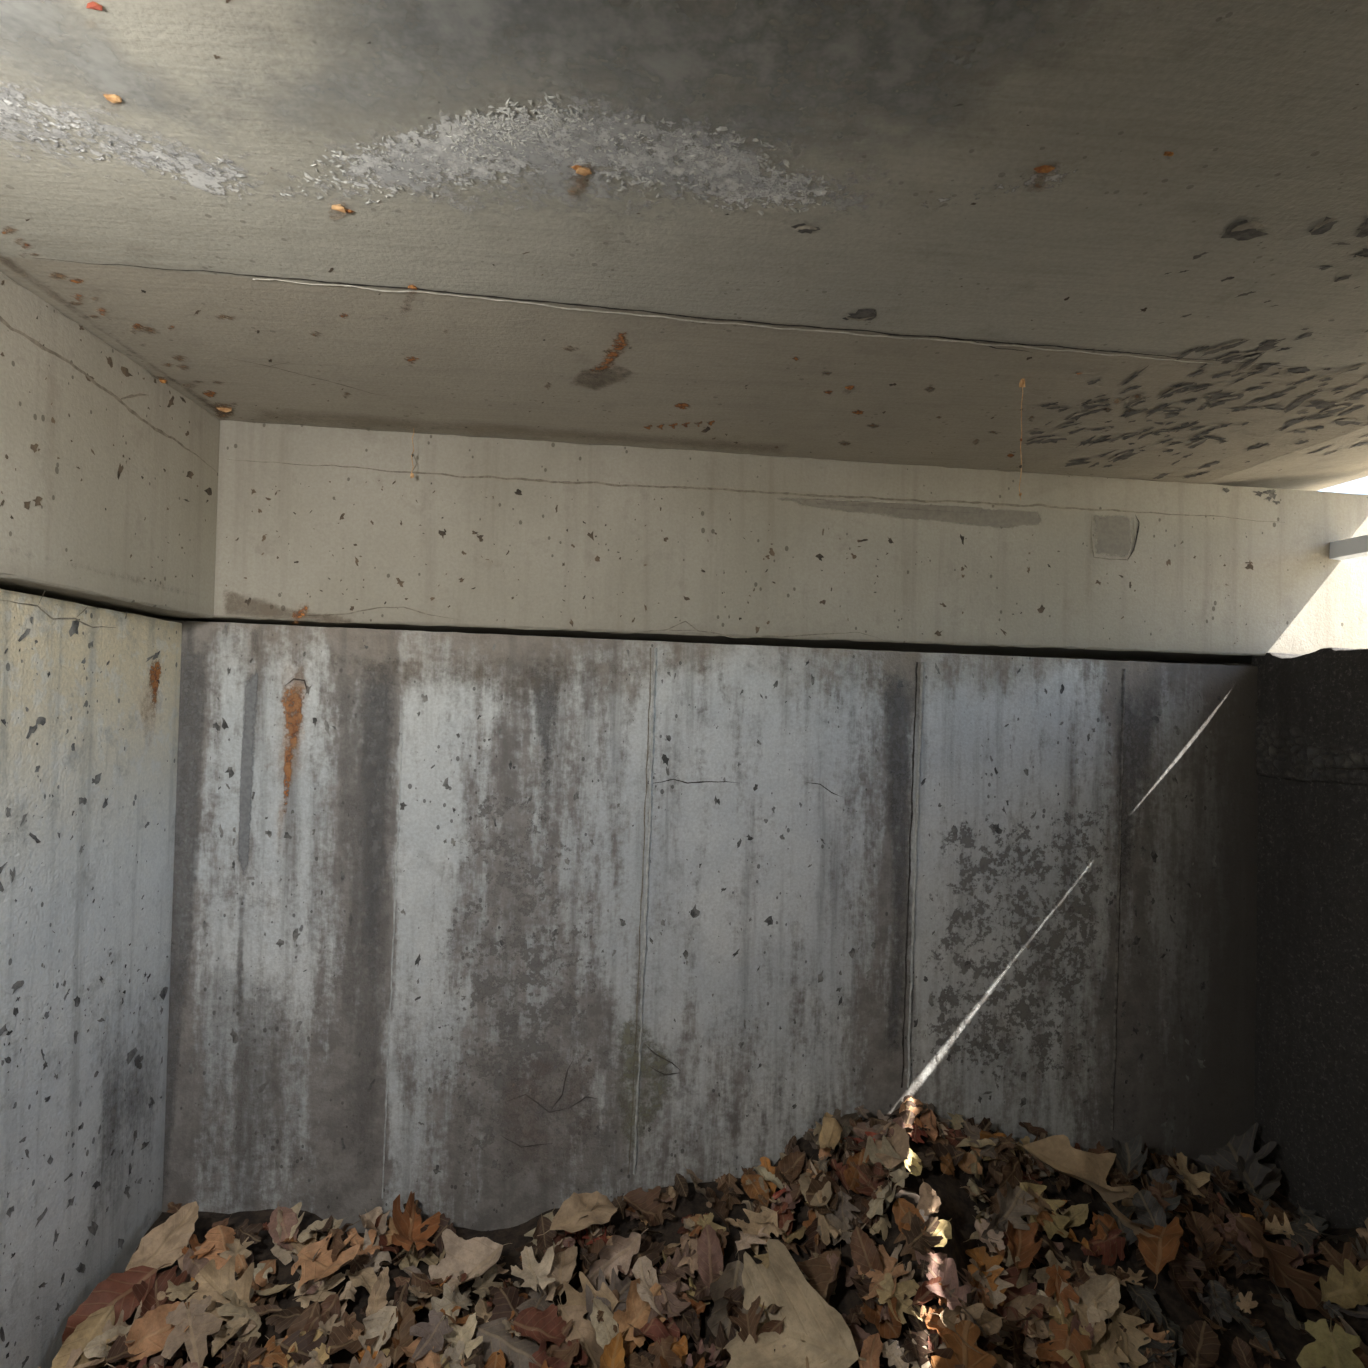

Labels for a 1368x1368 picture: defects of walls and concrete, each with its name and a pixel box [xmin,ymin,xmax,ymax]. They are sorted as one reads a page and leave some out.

leakage [280,0,1038,215]
corrosion [578,333,627,389]
crack [0,316,1285,523]
crack [37,258,1302,368]
peeling [1010,328,1368,479]
peeling [1165,220,1268,274]
corrosion [150,662,161,703]
leakage [238,673,258,870]
corrosion [282,687,304,812]
leakage [521,670,557,752]
leakage [164,643,204,1165]
leakage [885,682,909,1046]